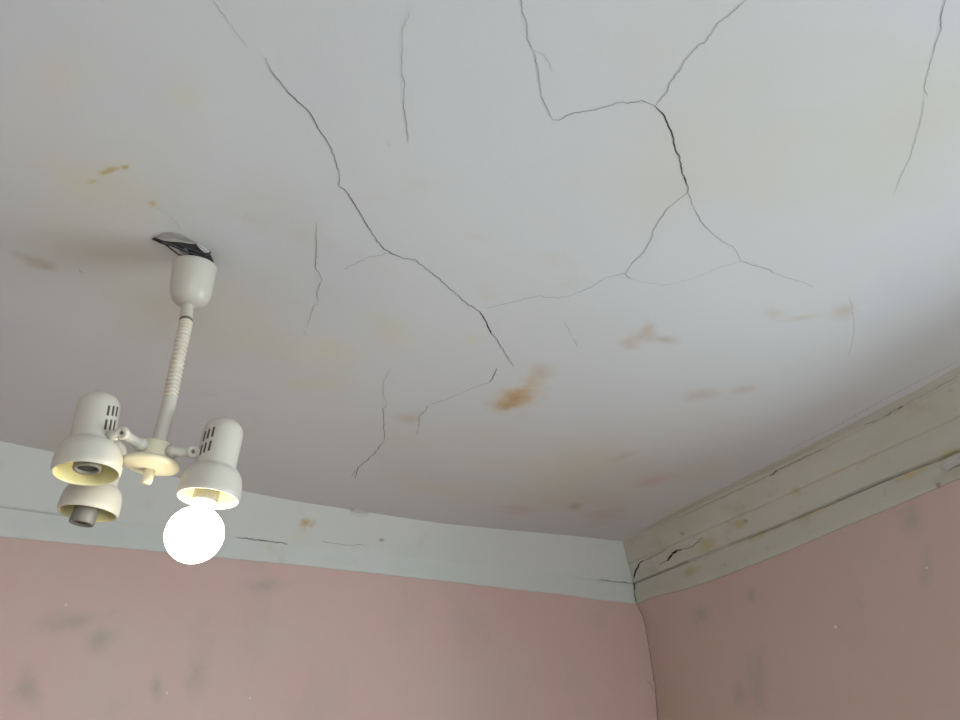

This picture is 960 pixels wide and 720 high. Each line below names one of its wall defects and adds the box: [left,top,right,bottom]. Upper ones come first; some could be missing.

crack [265,57,513,381]
crack [606,26,716,279]
crack [598,538,701,600]